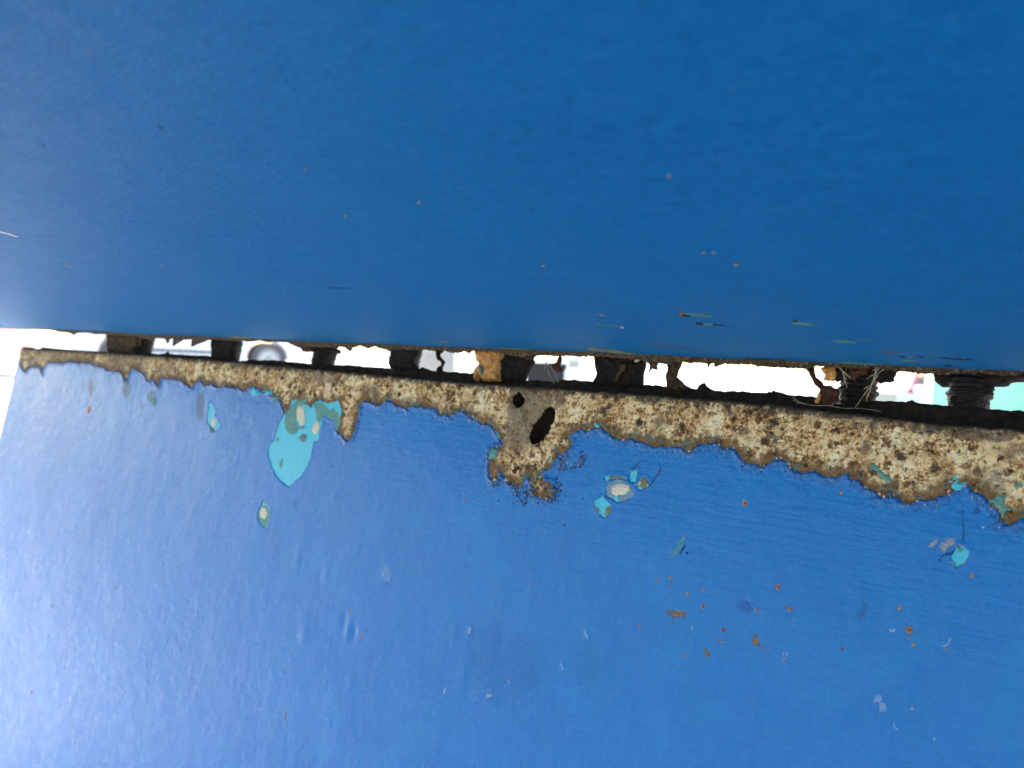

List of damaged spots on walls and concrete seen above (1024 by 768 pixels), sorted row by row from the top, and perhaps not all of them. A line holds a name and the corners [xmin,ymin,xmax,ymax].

peeling [250,386,279,402]
peeling [207,403,220,432]
corrosion [0,327,1024,528]
peeling [269,399,341,486]
peeling [593,470,650,518]
peeling [870,462,892,483]
peeling [949,475,967,490]
peeling [989,481,1023,518]
peeling [258,501,270,528]
peeling [951,545,969,567]